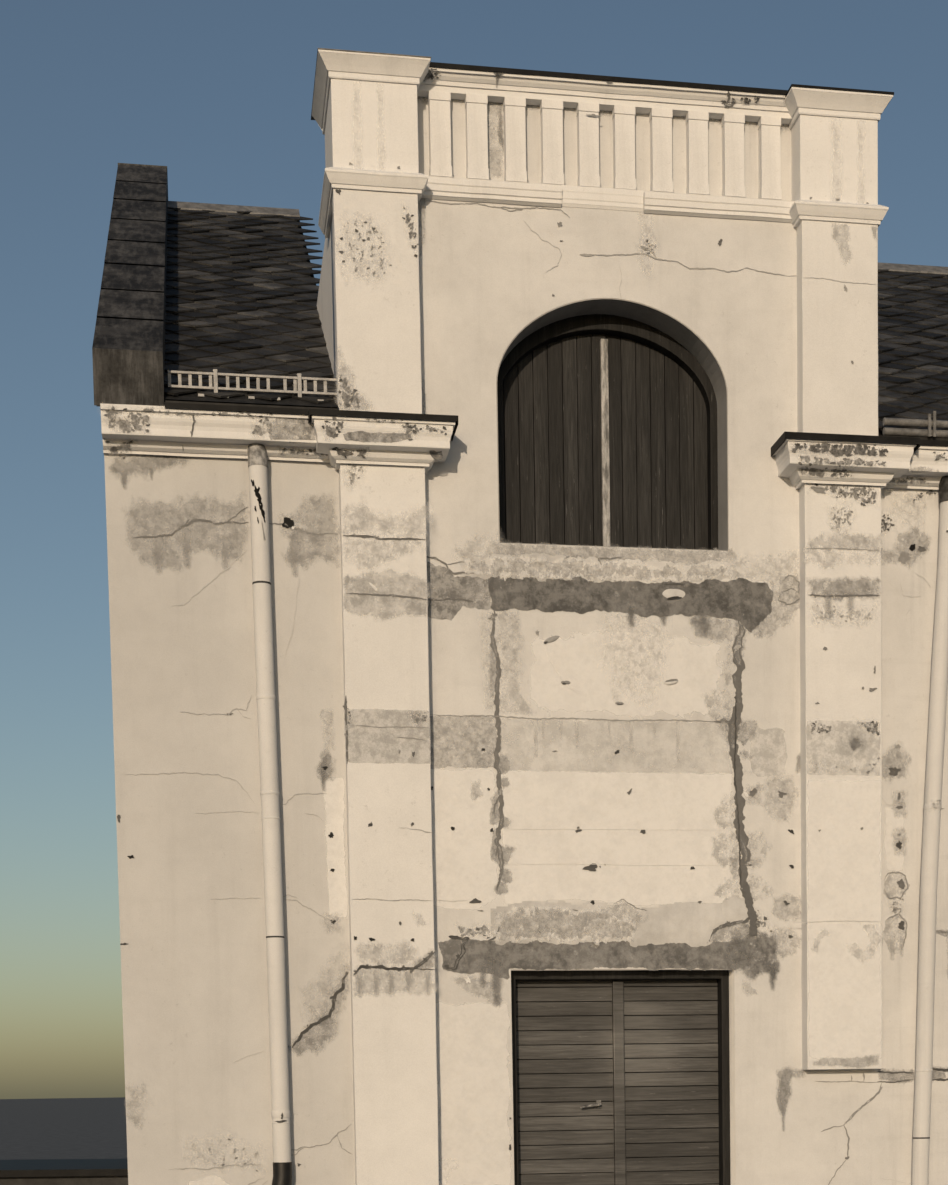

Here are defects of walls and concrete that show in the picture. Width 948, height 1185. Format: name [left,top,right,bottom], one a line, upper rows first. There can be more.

crack [422,200,871,296]
spalling [280,515,295,529]
peeling [792,443,888,530]
peeling [427,562,773,635]
flaking render [347,709,497,769]
crack [124,507,769,1063]
flaking render [744,725,787,798]
spalling [884,872,909,959]
peeling [438,925,747,1004]
crack [817,1073,883,1185]